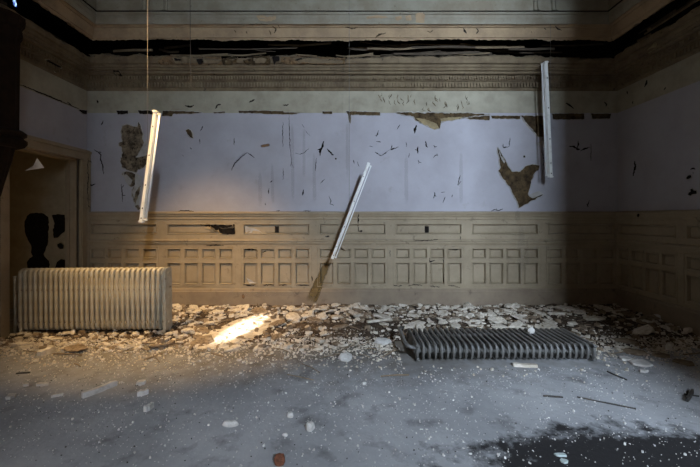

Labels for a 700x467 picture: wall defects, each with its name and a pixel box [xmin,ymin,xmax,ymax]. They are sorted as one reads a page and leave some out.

peeling [157,55,346,65]
crack [21,85,79,109]
flaking render [395,111,491,130]
flaking render [520,114,544,147]
flaking render [118,122,149,211]
crack [232,141,253,168]
flaking render [496,147,544,208]
peeling [24,212,65,268]